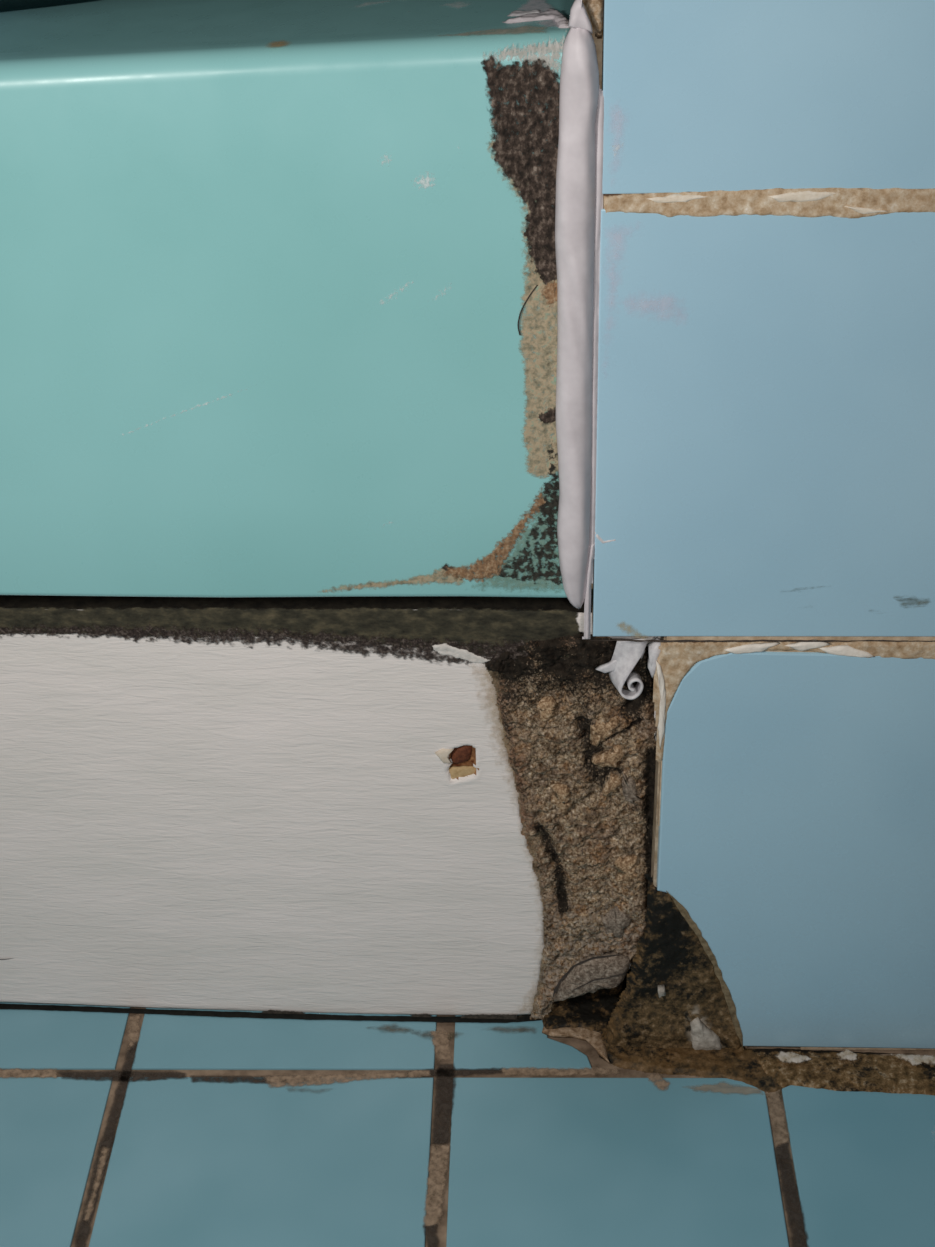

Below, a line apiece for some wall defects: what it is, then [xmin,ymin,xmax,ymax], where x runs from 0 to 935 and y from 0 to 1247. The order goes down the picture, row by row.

leakage [323,36,565,592]
leakage [0,607,579,702]
peeling [536,696,558,723]
peeling [589,716,625,796]
peeling [656,660,666,749]
spalling [542,854,783,1098]